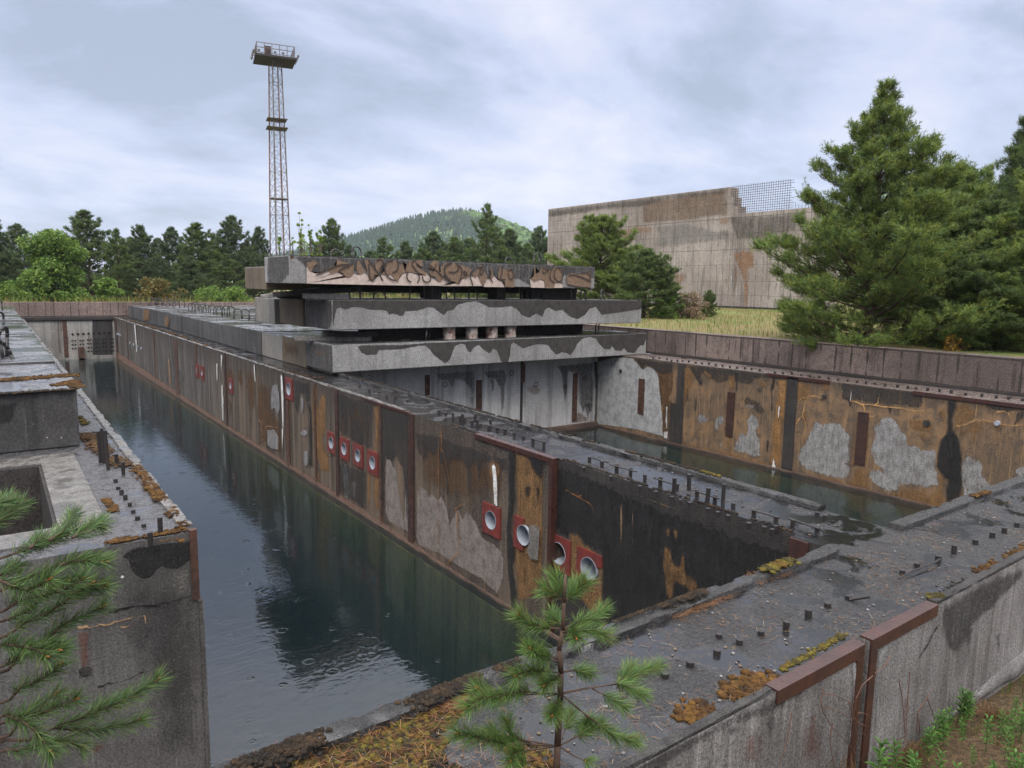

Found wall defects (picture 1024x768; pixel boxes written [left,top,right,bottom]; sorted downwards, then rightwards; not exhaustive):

rust [658,368,711,439]
spalling [720,405,760,456]
rust [686,380,828,466]
spalling [798,422,850,479]
crack [850,393,919,417]
spalling [870,416,938,491]
damp [937,399,962,501]
spalling [385,459,503,594]
rust [515,453,542,599]
rust [664,529,697,598]
damp [944,571,1023,652]